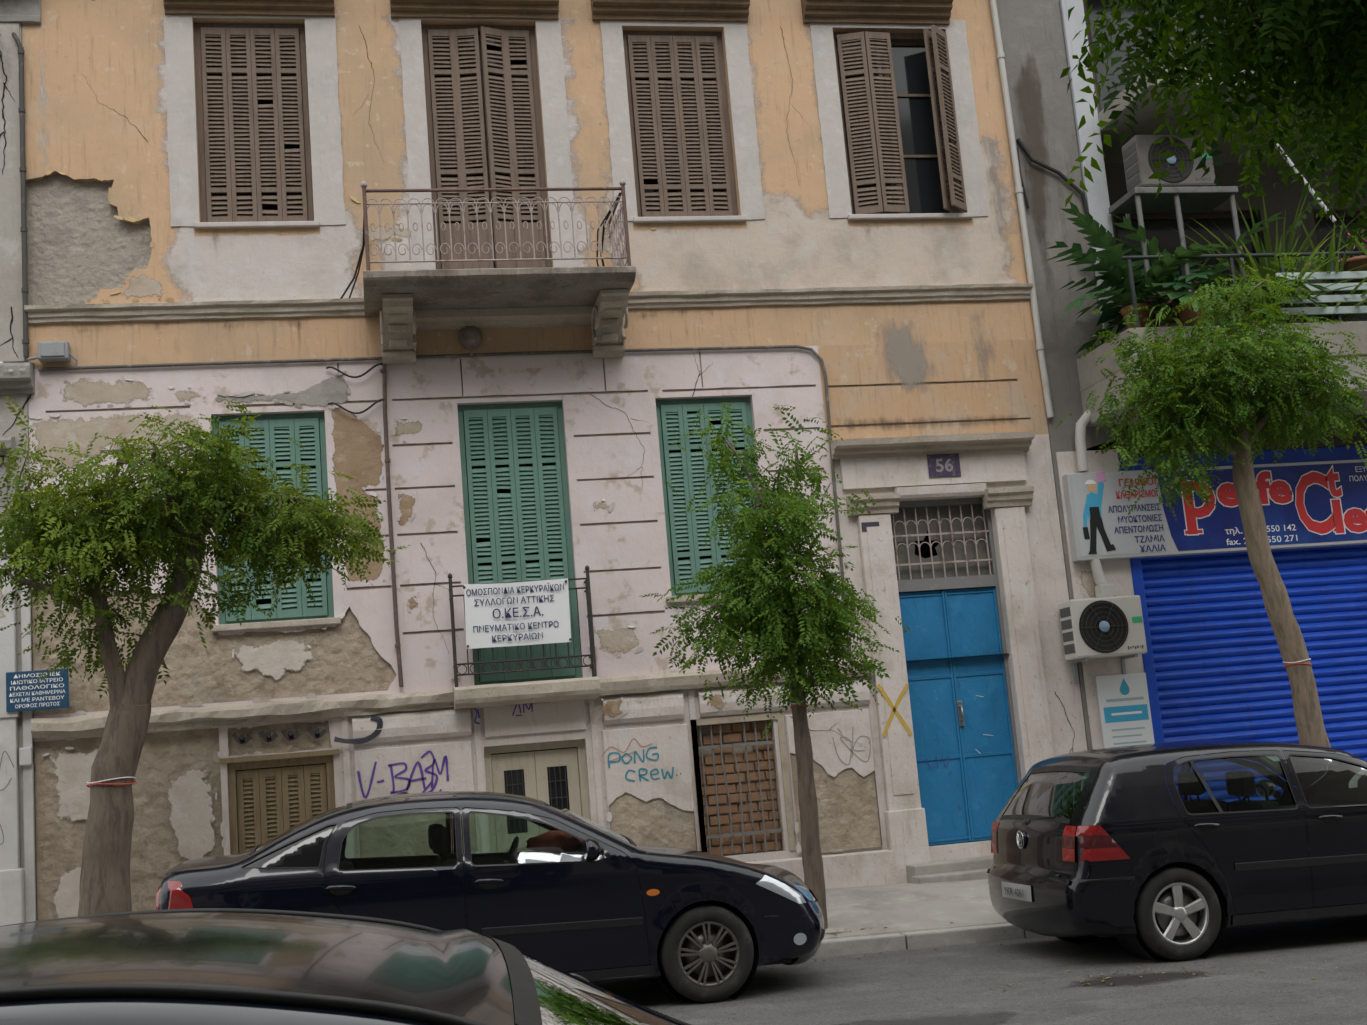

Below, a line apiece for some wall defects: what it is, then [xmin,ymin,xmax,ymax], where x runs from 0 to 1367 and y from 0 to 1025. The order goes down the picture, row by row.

crack [0,51,15,174]
spalling [26,116,415,305]
peeling [560,18,1018,292]
peeling [331,405,422,586]
spalling [31,584,164,716]
spalling [151,598,396,708]
spalling [34,737,102,921]
spalling [130,720,332,911]
spalling [607,792,697,851]
spalling [790,753,882,854]